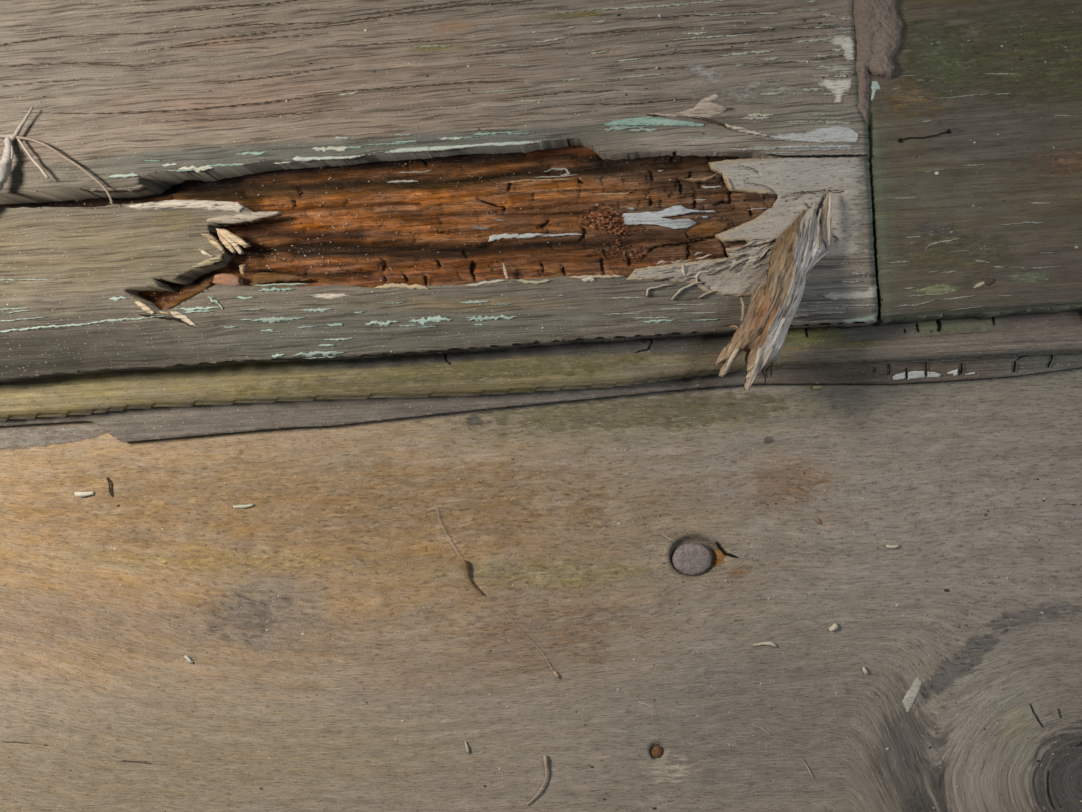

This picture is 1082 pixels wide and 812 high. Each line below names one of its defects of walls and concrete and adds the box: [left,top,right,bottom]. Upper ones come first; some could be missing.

crack [0,0,845,128]
peeling [537,0,779,43]
peeling [720,0,854,103]
peeling [871,75,922,100]
spalling [0,113,877,359]
peeling [907,236,1061,269]